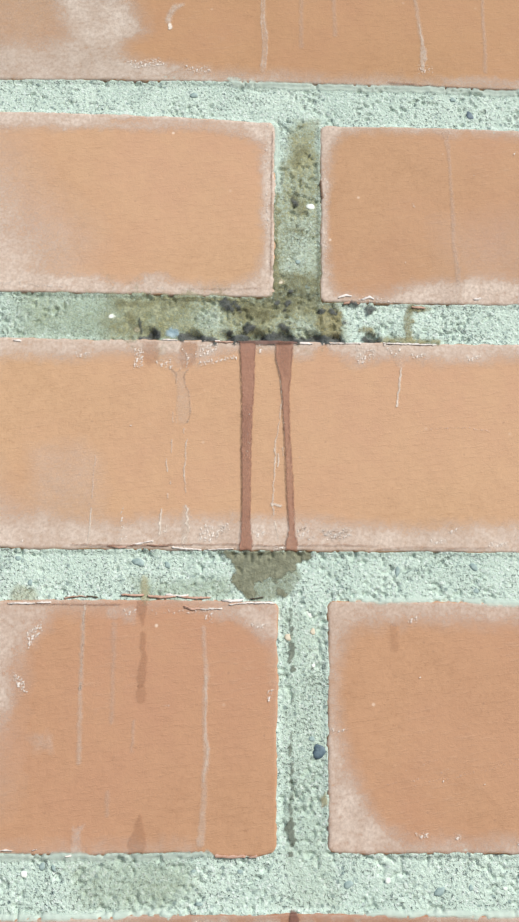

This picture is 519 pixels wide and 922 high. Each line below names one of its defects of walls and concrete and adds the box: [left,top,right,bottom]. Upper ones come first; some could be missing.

damp [0,112,519,637]
damp [0,600,48,711]
damp [288,621,296,672]
damp [329,602,519,663]
damp [285,737,296,857]
damp [327,716,451,854]